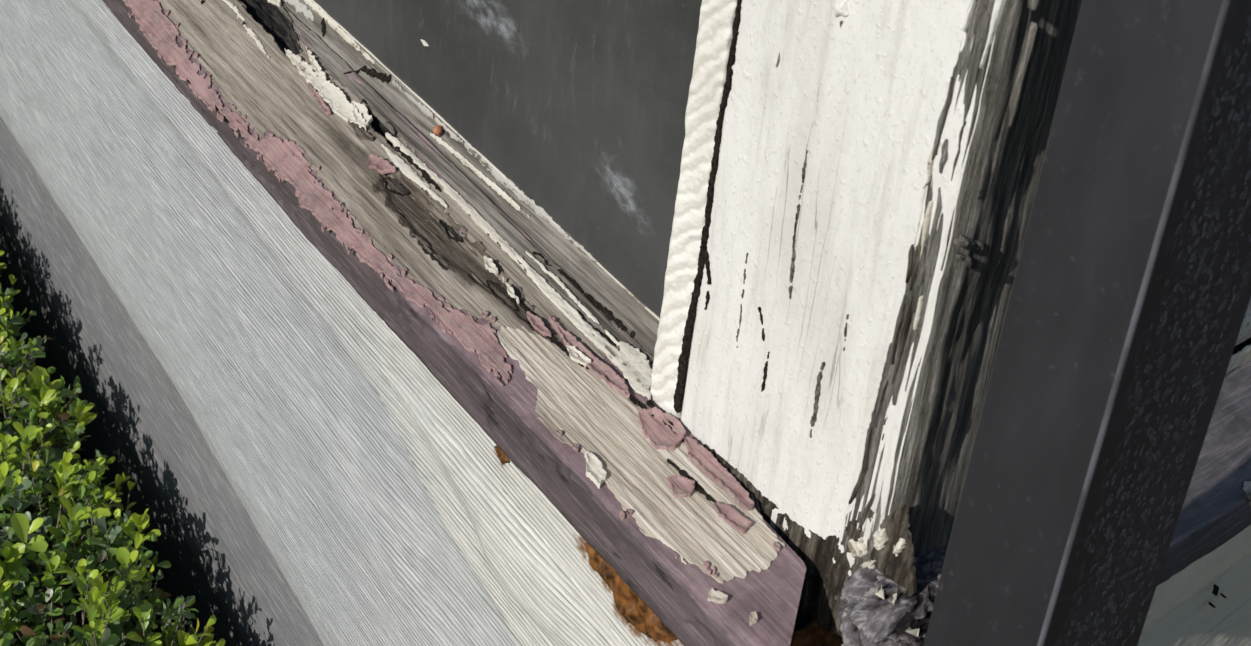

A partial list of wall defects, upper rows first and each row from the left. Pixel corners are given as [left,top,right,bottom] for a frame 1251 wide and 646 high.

peeling [1009,0,1040,129]
peeling [123,0,785,604]
peeling [841,0,1006,569]
peeling [1238,315,1251,336]
corrosion [578,536,682,646]
corrosion [791,619,843,646]
peeling [874,582,908,605]